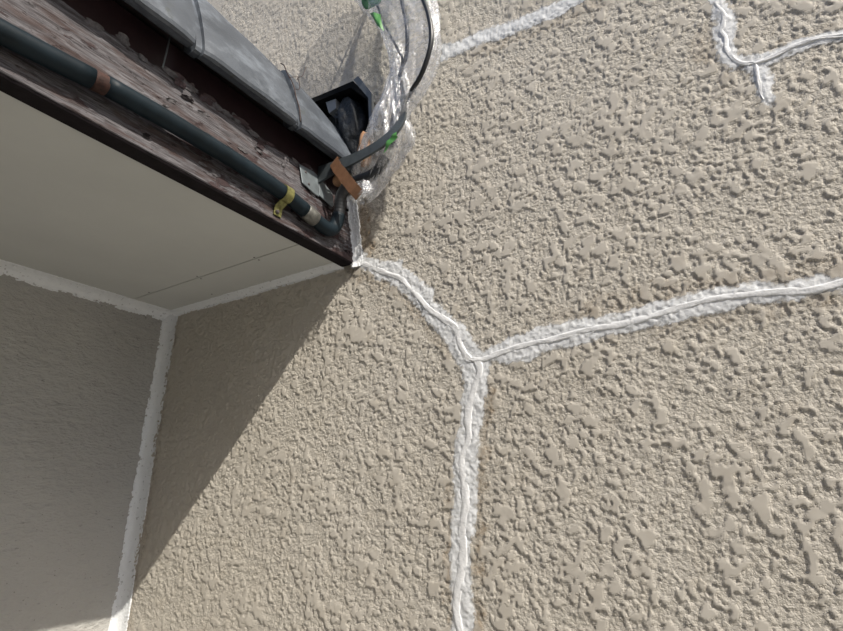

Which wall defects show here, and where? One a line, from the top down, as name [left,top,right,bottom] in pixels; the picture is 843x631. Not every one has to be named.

crack [440,0,584,62]
crack [708,0,843,108]
peeling [161,66,275,155]
crack [358,251,843,631]